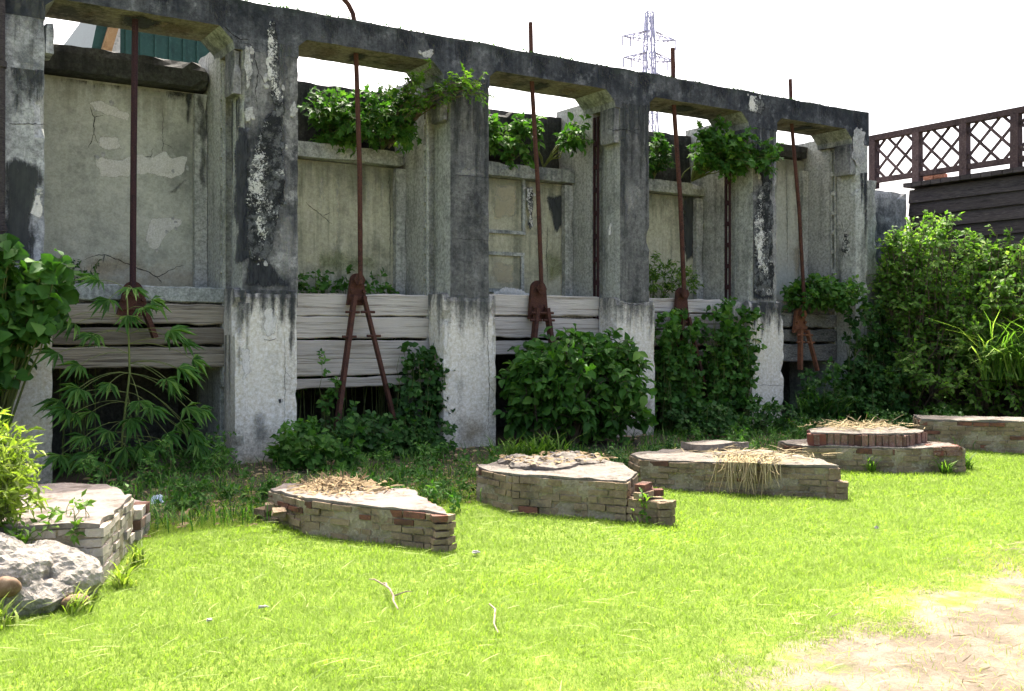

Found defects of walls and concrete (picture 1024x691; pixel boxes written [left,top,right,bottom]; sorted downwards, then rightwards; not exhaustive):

peeling [90,100,129,120]
peeling [94,136,189,178]
leakage [5,158,43,262]
leakage [547,195,562,232]
peeling [146,216,182,253]
leakage [225,99,296,396]
crack [85,254,184,279]